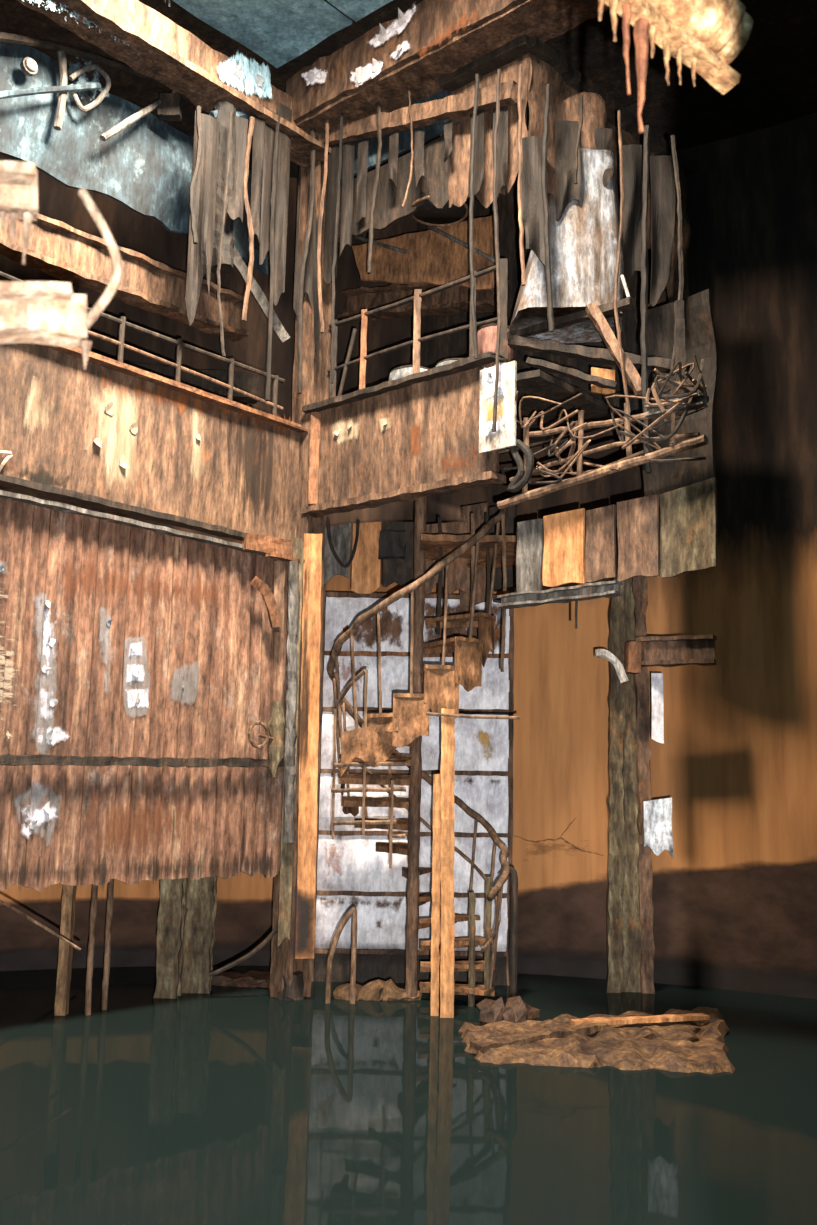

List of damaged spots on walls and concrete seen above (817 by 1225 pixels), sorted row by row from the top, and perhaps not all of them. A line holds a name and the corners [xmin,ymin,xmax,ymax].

peeling [33,595,68,754]
peeling [15,779,59,845]